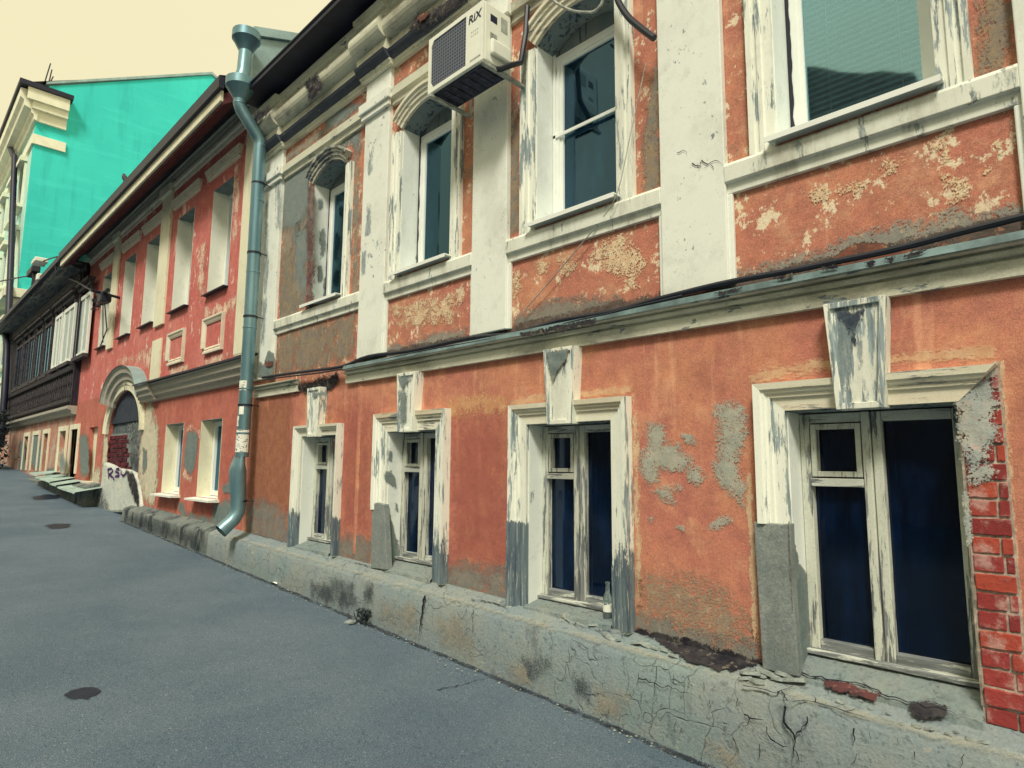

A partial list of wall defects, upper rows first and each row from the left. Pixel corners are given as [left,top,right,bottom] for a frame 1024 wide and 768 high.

flaking render [286,100,364,163]
flaking render [338,130,373,293]
flaking render [737,135,1024,276]
flaking render [258,163,356,378]
peeling [387,290,468,352]
peeling [512,233,648,326]
peeling [638,398,750,531]
peeling [505,520,529,606]
flaking render [953,361,1024,732]
crack [418,595,426,635]
crack [623,664,976,766]